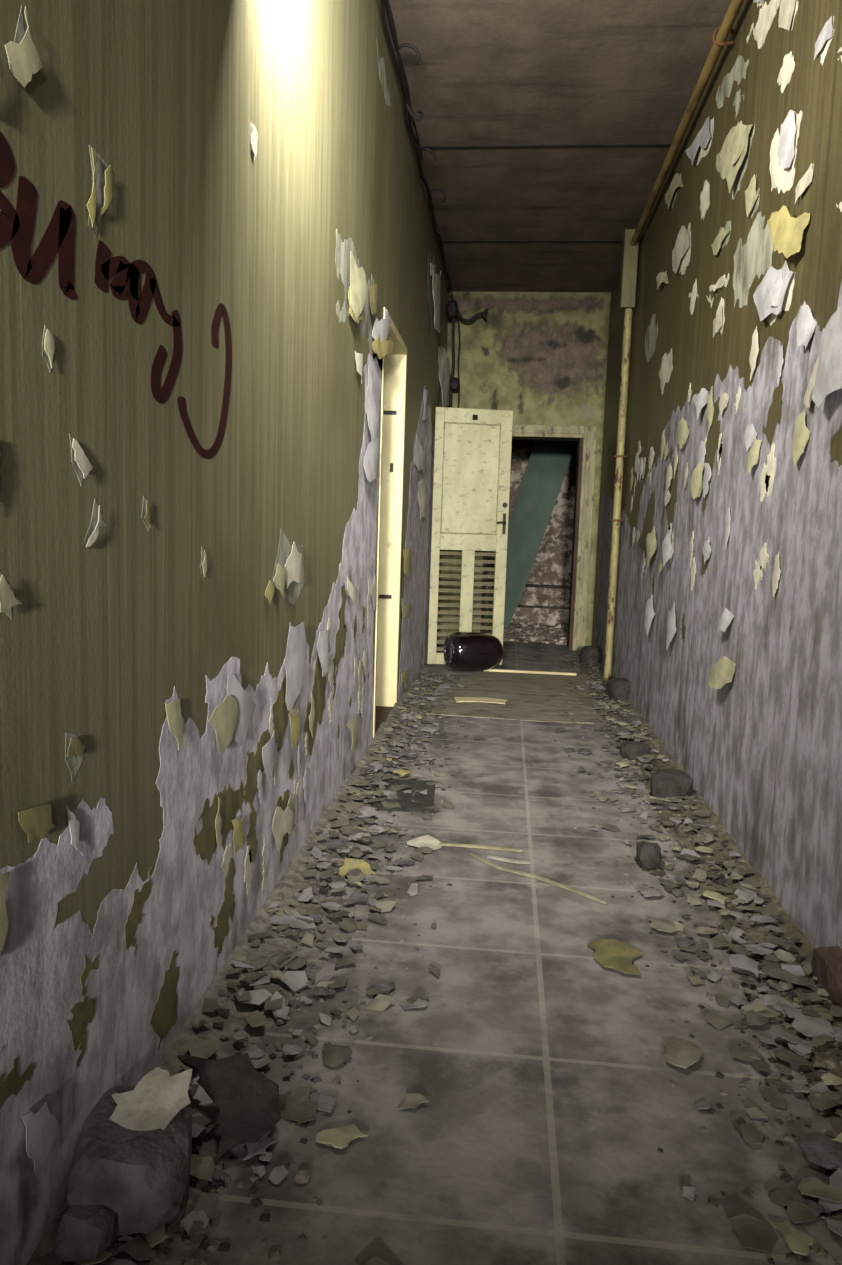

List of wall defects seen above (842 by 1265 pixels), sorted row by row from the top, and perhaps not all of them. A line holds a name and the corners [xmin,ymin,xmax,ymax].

peeling [0,5,43,88]
peeling [249,120,258,161]
peeling [86,145,114,236]
peeling [594,0,842,949]
peeling [0,229,393,1265]